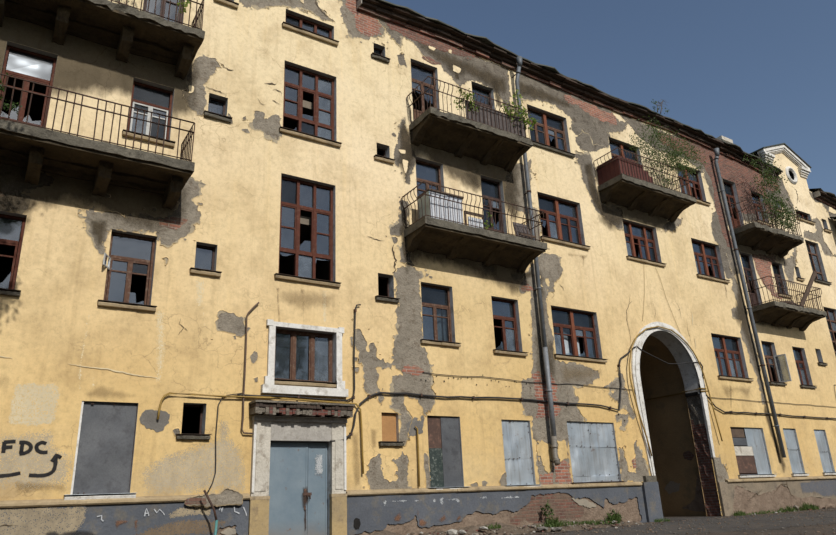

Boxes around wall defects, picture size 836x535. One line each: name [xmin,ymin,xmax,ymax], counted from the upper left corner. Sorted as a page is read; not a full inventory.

peeling [182,54,223,119]
peeling [76,176,207,266]
flaking render [227,0,798,405]
peeling [803,191,836,257]
peeling [211,309,251,340]
peeling [349,196,436,490]
peeling [507,159,650,485]
peeling [140,409,181,437]